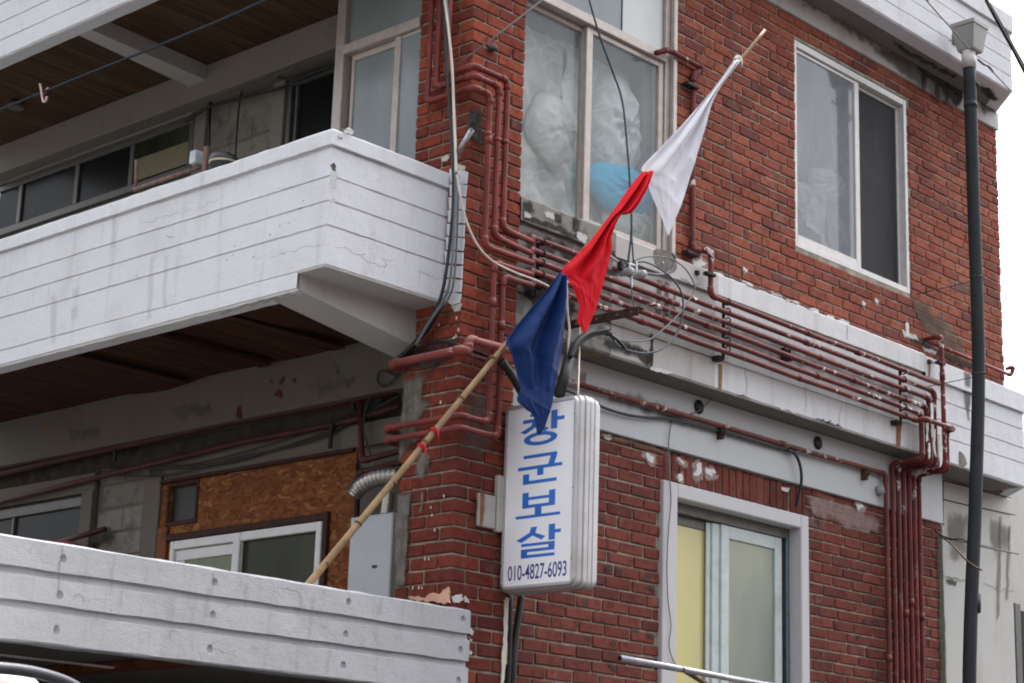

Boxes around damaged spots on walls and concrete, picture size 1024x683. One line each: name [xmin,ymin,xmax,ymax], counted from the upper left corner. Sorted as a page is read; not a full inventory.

spalling [408,587,451,605]
leakage [997,518,1010,618]